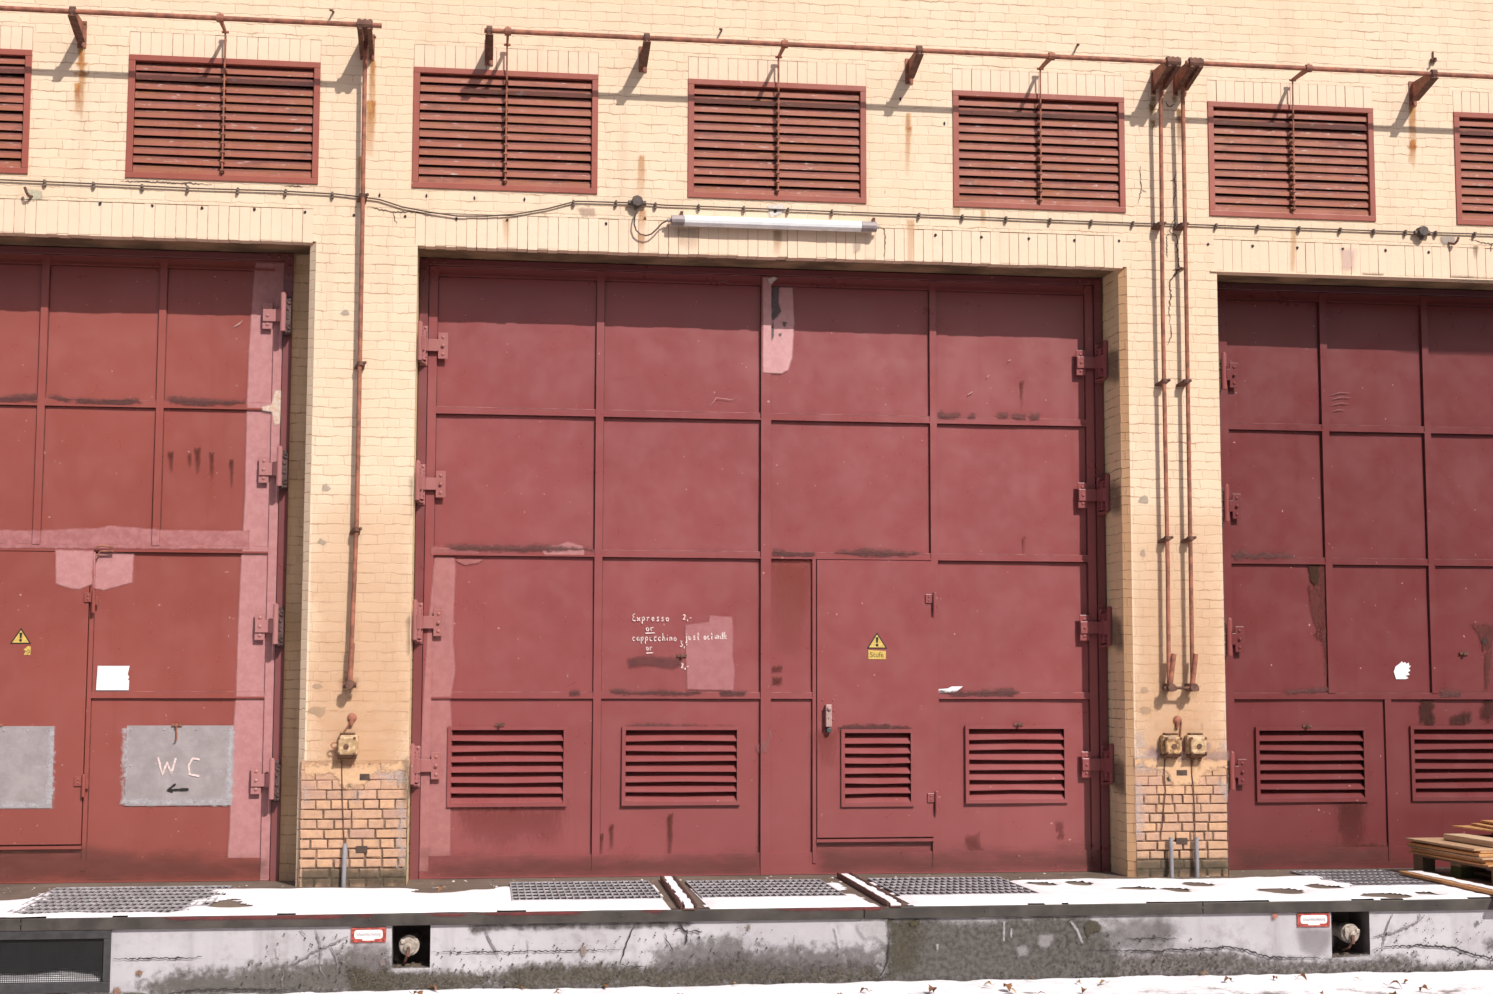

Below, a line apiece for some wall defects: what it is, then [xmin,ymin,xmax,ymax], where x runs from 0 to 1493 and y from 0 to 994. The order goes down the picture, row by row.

corrosion [75,48,88,97]
crack [1138,166,1180,344]
peeling [768,277,787,339]
crack [1372,914,1493,959]